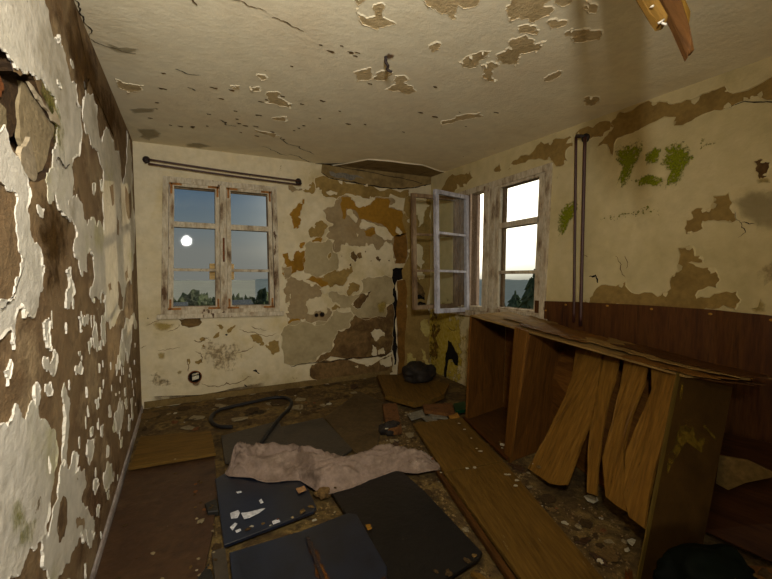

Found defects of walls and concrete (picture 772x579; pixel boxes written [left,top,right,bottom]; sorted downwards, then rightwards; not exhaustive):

peeling [353,0,396,31]
peeling [422,0,481,20]
peeling [459,0,604,82]
peeling [353,67,417,95]
peeling [494,76,772,173]
crack [729,100,772,108]
damp [615,141,694,187]
peeling [754,158,772,180]
peeling [684,192,738,235]
peeling [0,0,137,579]
peeling [282,159,473,366]
peeling [585,245,741,310]